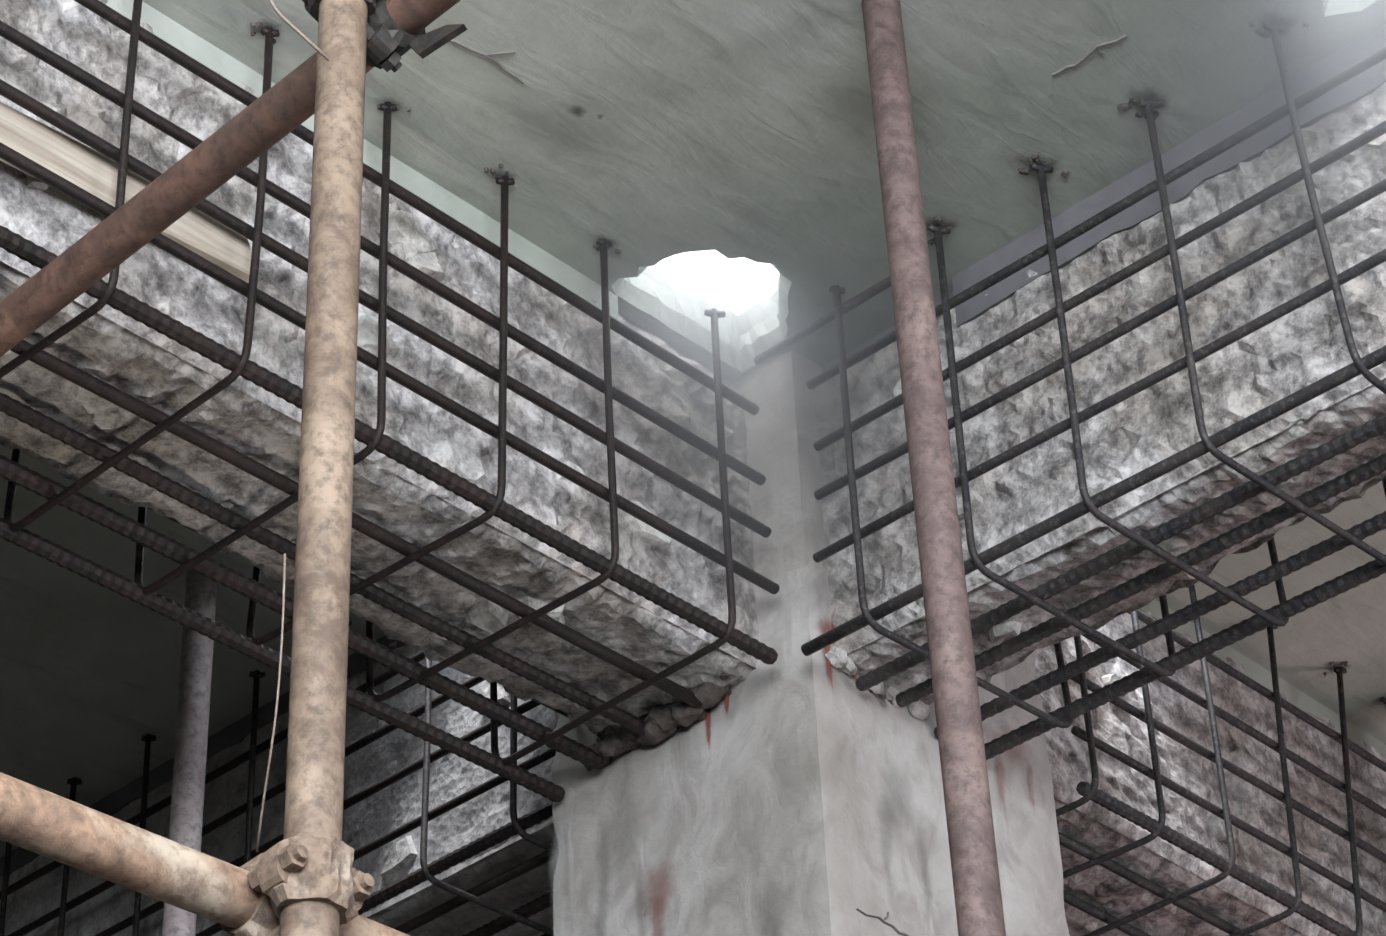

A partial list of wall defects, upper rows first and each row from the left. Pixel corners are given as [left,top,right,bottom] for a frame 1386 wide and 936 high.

spalling [0,0,259,174]
spalling [0,248,41,302]
spalling [0,161,106,256]
spalling [102,133,313,389]
spalling [0,292,302,588]
spalling [343,176,759,936]
spalling [814,341,934,720]
spalling [936,71,1386,936]
rust [824,623,834,683]
spalling [201,712,289,867]
spalling [0,855,164,936]
crack [856,908,909,936]